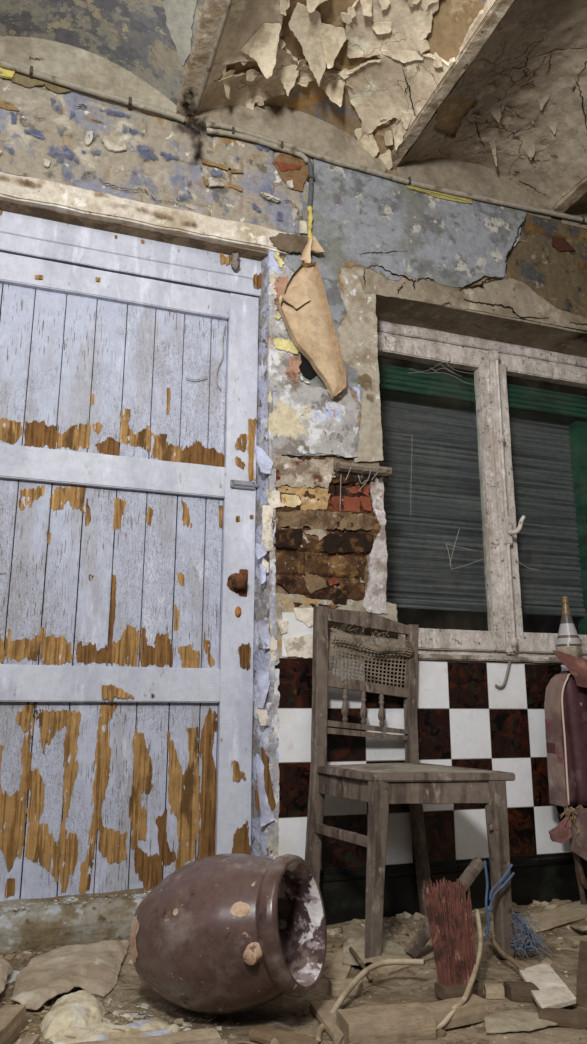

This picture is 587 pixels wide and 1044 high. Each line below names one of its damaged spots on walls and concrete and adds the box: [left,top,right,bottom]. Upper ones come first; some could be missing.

peeling [0,67,179,168]
peeling [198,0,587,210]
crack [403,65,417,116]
crack [494,38,587,128]
spalling [179,156,243,199]
peeling [252,192,282,220]
crack [359,220,587,328]
spalling [273,338,317,386]
spalling [0,408,388,726]
peeling [0,684,217,898]
peeling [231,754,275,855]